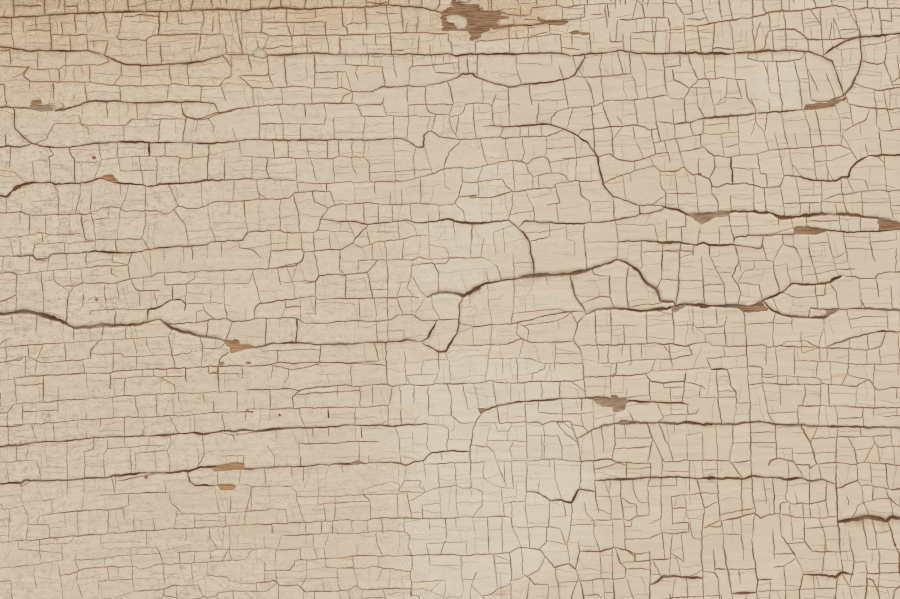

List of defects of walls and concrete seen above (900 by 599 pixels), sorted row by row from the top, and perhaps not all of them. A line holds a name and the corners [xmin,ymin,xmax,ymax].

peeling [440,0,516,40]
crack [0,268,95,343]
peeling [224,339,254,353]
crack [195,352,243,402]
crack [0,370,434,502]
peeling [592,395,630,424]
peeling [210,462,244,471]
crack [8,504,109,557]
crack [60,479,264,599]
crack [253,480,430,541]
crack [256,559,438,599]
crack [347,507,514,599]